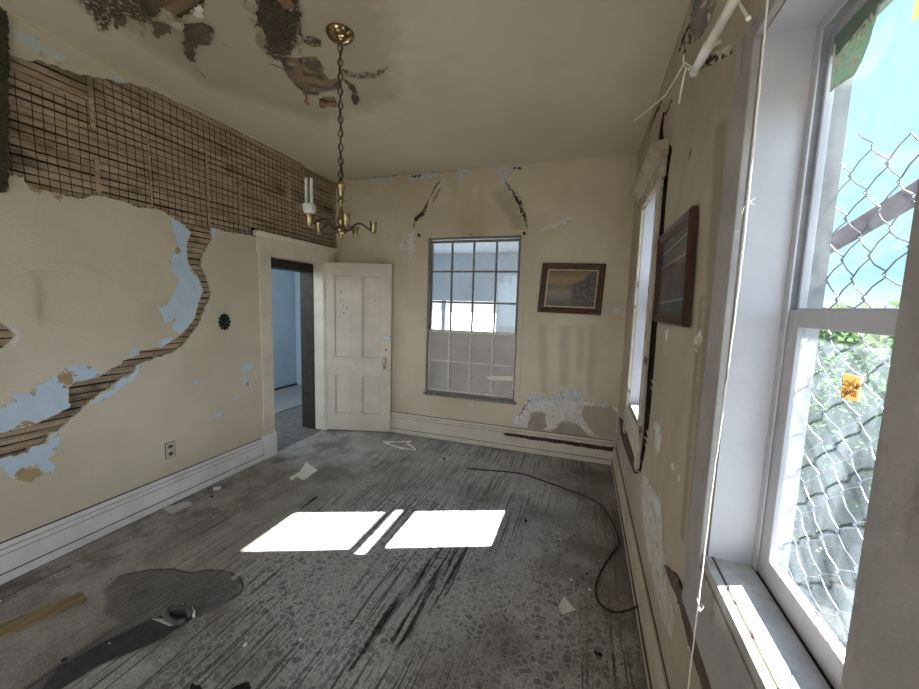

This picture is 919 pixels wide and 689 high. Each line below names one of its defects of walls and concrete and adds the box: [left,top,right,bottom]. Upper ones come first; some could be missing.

peeling [111,14,127,30]
peeling [151,3,215,62]
spalling [243,0,340,108]
crack [354,170,457,227]
crack [504,183,529,229]
spalling [0,25,337,483]
peeling [503,389,619,452]